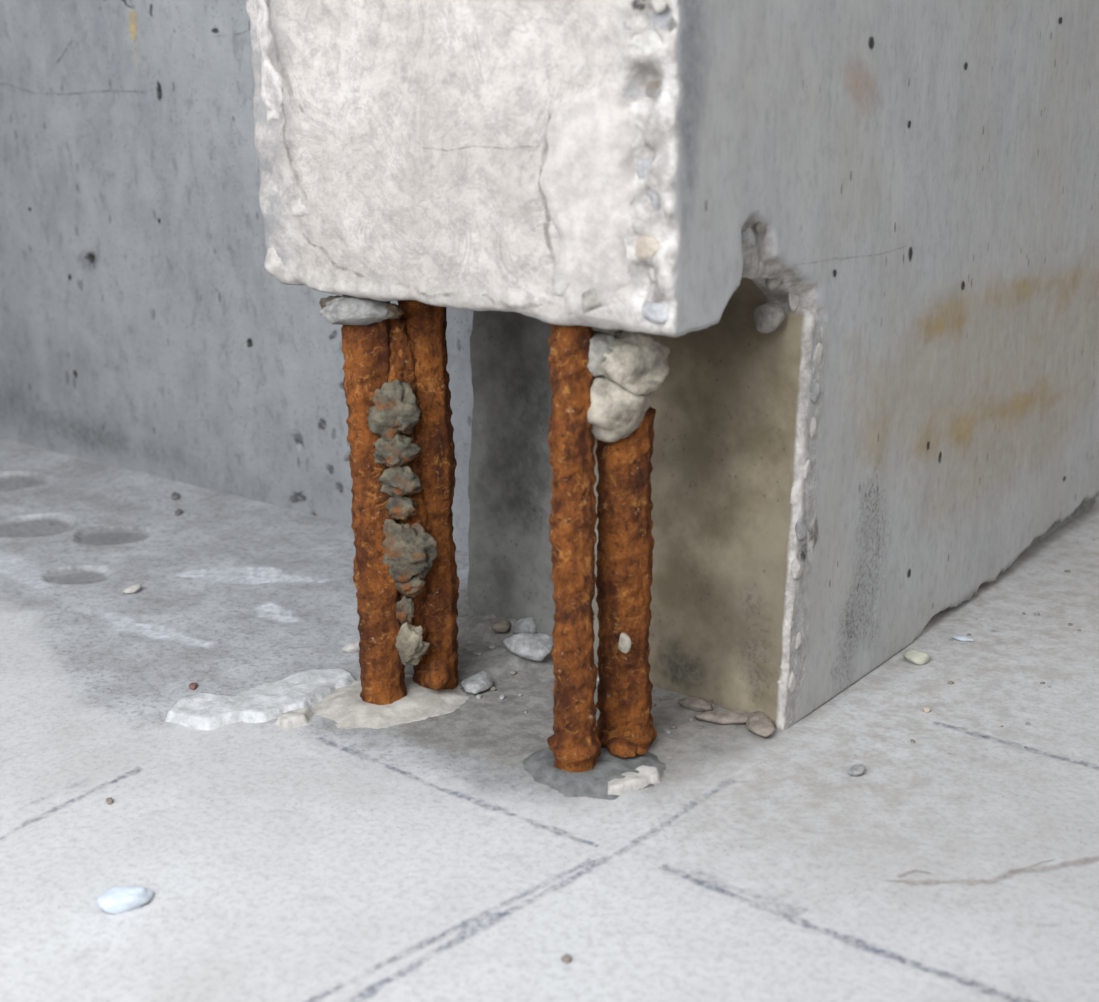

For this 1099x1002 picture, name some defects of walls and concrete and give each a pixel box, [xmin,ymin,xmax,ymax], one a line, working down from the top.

peeling [319,295,341,309]
rust [388,317,428,530]
spalling [790,326,823,579]
rust [398,571,451,690]
spalling [787,598,807,723]
rust [597,737,648,758]
crack [897,857,1099,884]